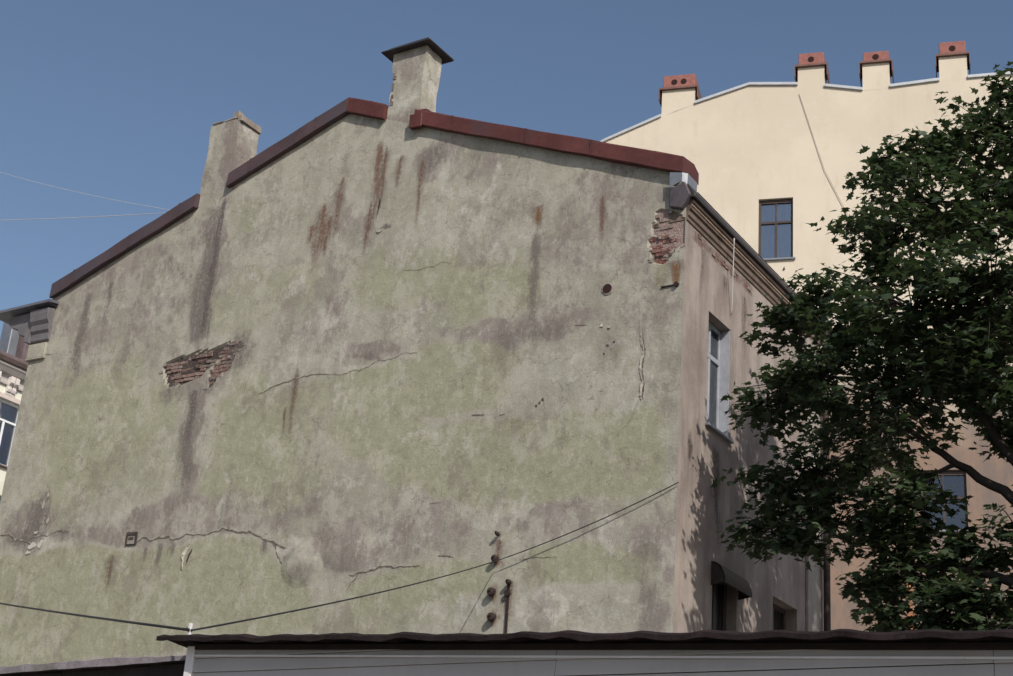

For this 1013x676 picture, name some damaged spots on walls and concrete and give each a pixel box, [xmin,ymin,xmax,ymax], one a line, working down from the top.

spalling [648,210,687,264]
water stain [192,201,226,339]
spalling [159,334,249,396]
crack [259,352,417,394]
water stain [179,391,196,486]
crack [0,530,71,544]
crack [137,526,286,564]
crack [347,555,454,590]